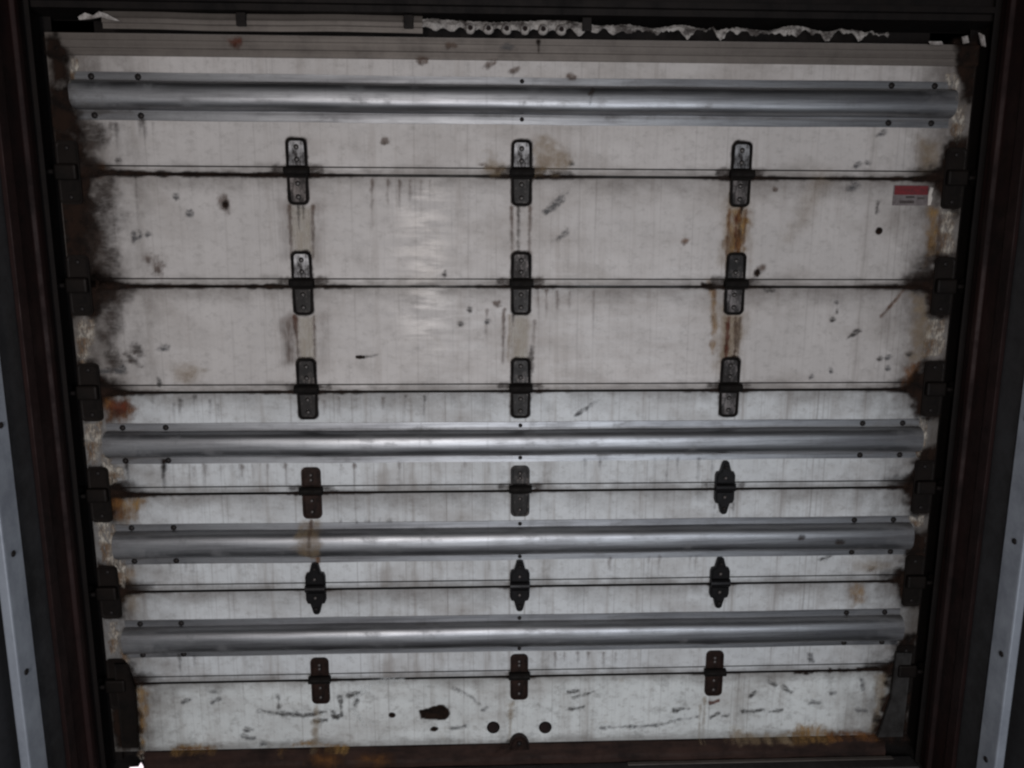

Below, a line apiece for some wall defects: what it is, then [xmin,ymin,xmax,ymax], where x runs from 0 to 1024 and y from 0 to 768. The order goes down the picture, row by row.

corrosion [725,207,748,253]
corrosion [701,283,740,356]
corrosion [104,400,135,421]